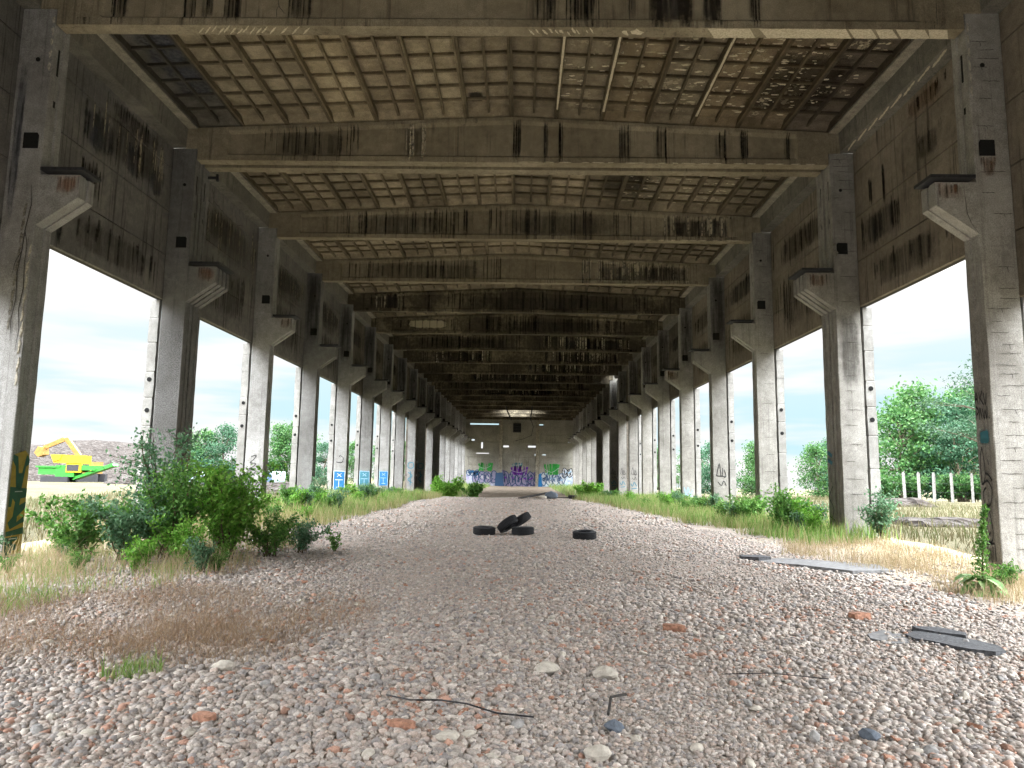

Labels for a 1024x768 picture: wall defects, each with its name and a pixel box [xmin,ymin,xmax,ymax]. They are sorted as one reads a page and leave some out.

peeling [529,28,948,151]
leakage [84,92,164,195]
leakage [861,166,900,244]
crack [10,189,32,348]
leakage [400,291,629,396]